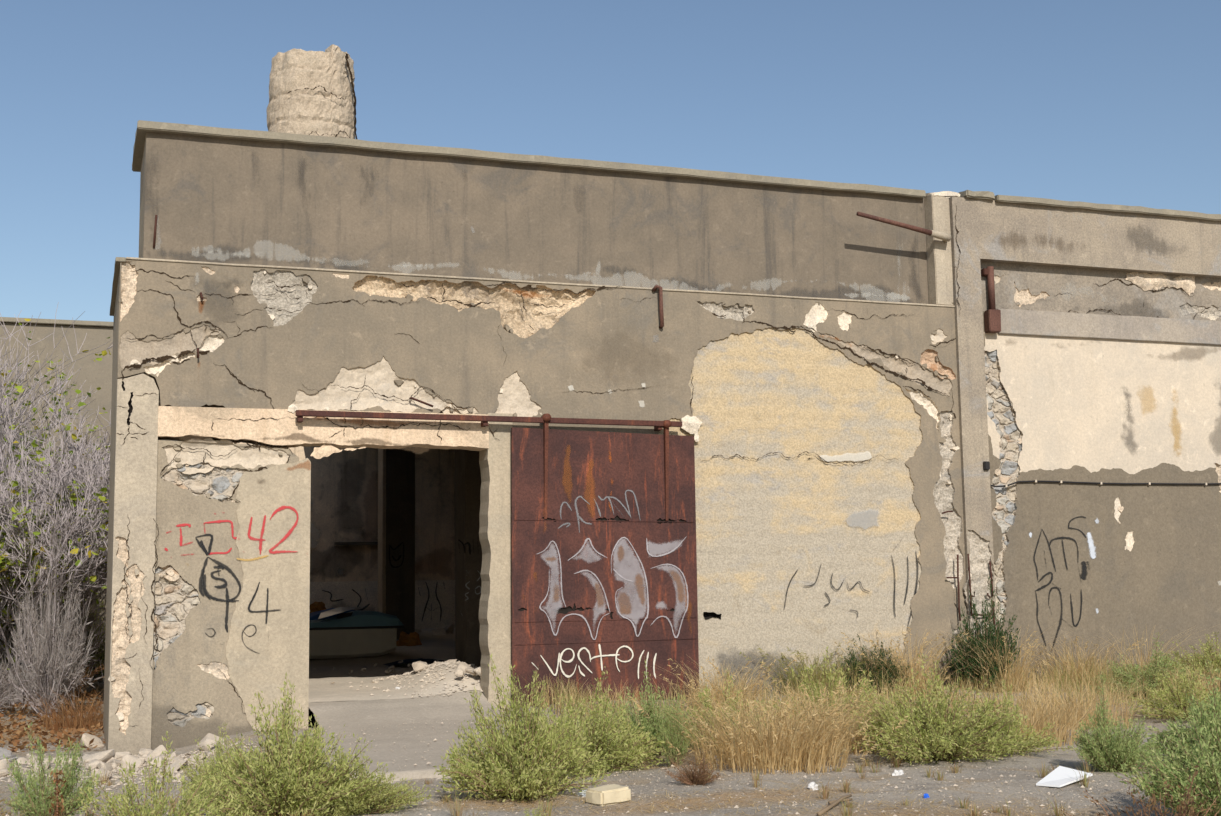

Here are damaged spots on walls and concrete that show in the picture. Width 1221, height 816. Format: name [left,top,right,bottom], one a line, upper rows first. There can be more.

spalling [234,269,318,326]
spalling [333,273,596,338]
spalling [994,275,1050,307]
spalling [1202,281,1221,291]
spalling [292,356,479,414]
crack [118,268,656,499]
spalling [495,371,542,417]
spalling [160,438,290,503]
crack [698,451,898,464]
flaking render [658,301,1023,695]
crack [117,515,159,707]
spalling [108,536,201,736]